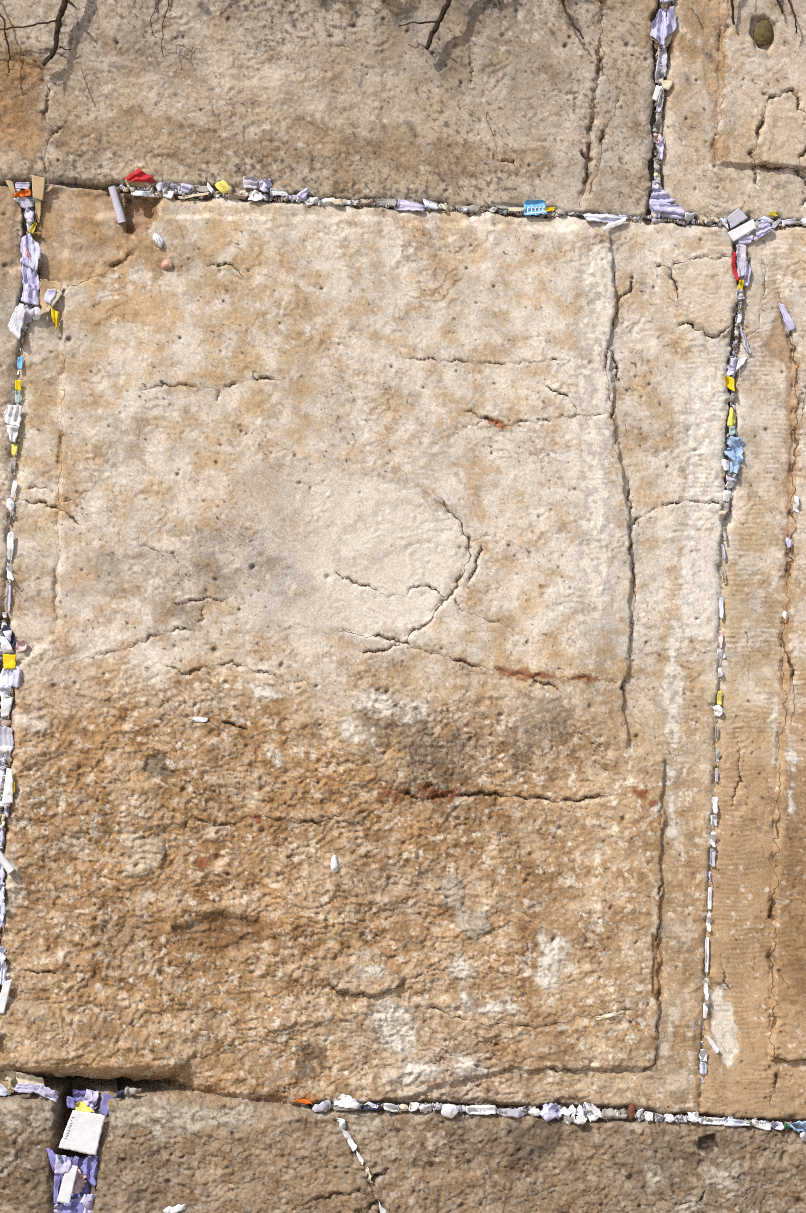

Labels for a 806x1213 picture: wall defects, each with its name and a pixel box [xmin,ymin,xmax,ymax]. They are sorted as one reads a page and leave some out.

crack [579,0,621,213]
crack [712,0,806,205]
crack [336,235,806,1107]